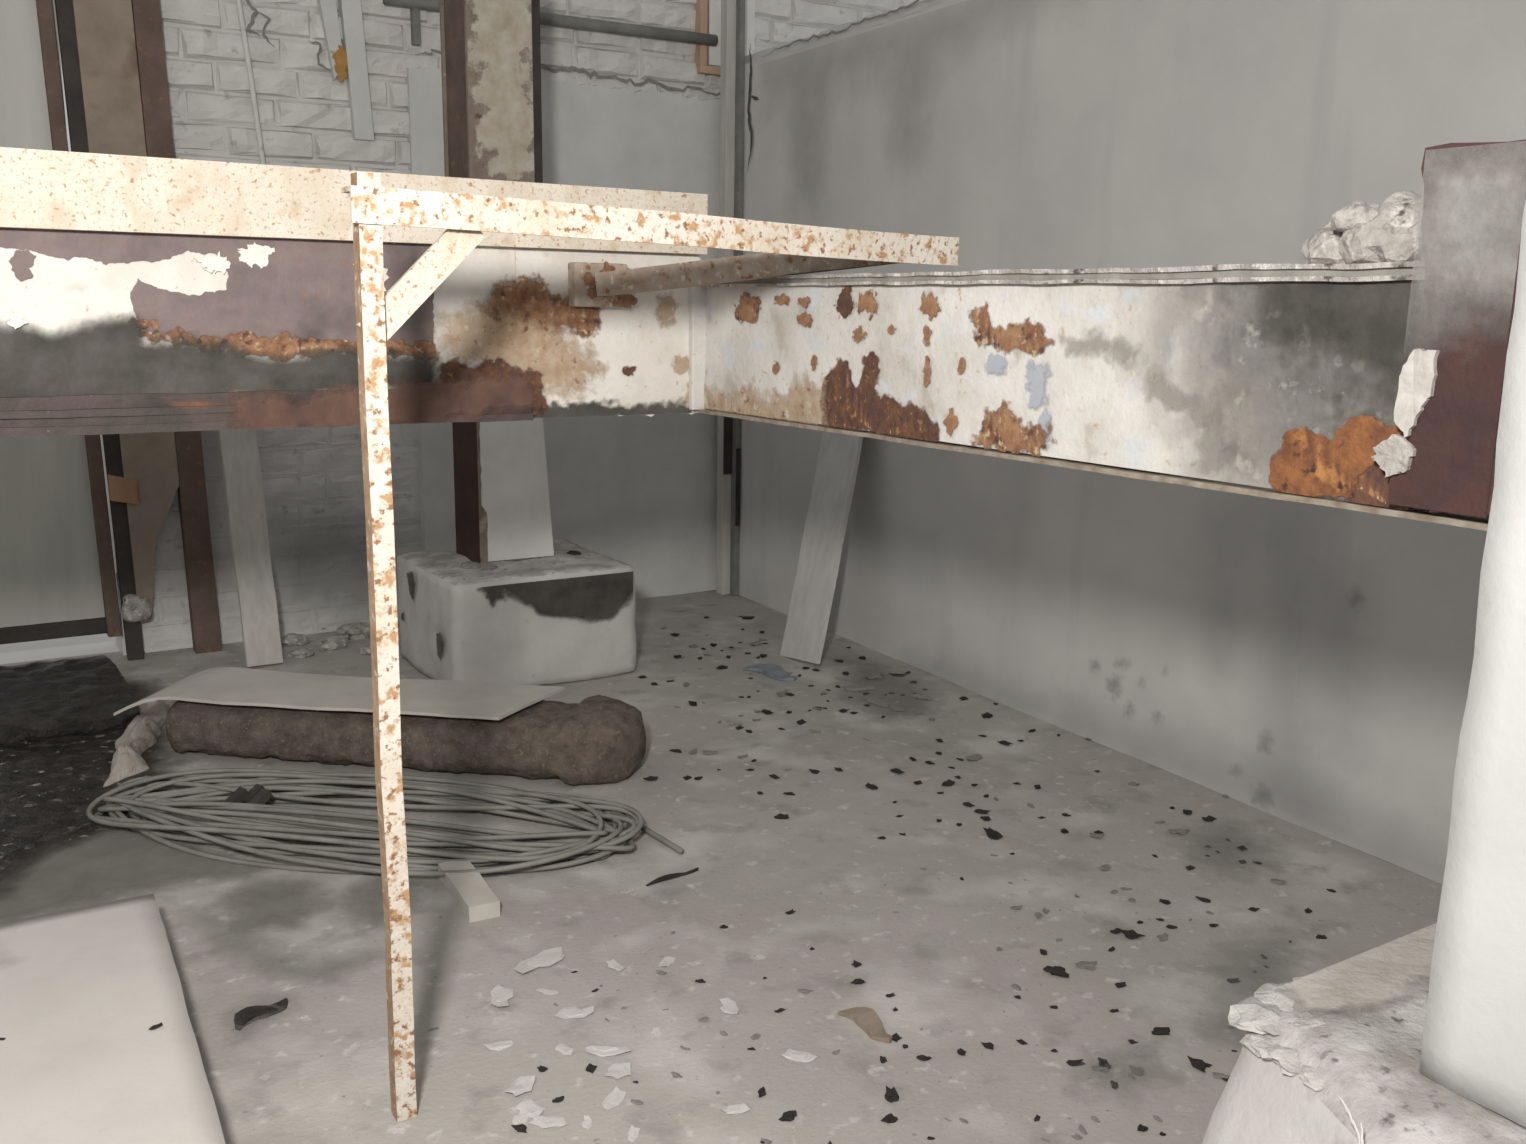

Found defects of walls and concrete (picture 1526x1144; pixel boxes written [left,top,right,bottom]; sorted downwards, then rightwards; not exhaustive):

peeling [0,227,357,343]
peeling [383,243,432,295]
peeling [389,292,434,347]
corrosion [386,261,638,424]
corrosion [674,286,958,442]
corrosion [969,303,1054,356]
corrosion [972,400,1052,457]
leakage [1061,336,1128,362]
leakage [1149,374,1224,469]
corrosion [1269,279,1516,518]
peeling [1371,349,1440,477]
spalling [1228,923,1437,1091]